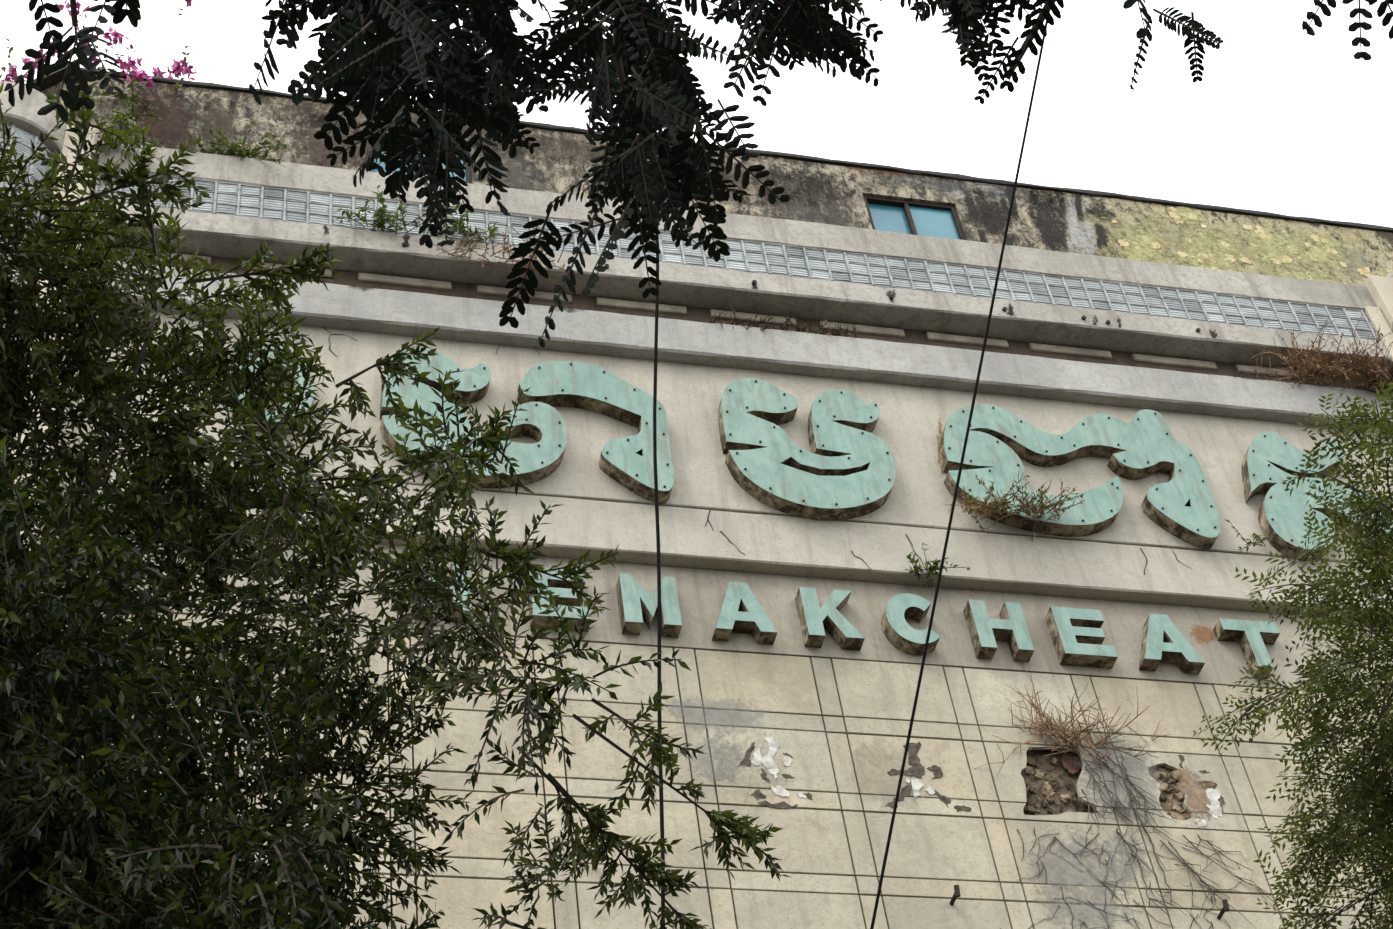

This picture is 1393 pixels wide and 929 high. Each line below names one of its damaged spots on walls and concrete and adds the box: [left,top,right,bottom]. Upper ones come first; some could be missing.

damp [194,94,383,169]
damp [457,125,624,200]
damp [707,164,853,227]
damp [881,175,1114,255]
damp [1377,231,1393,246]
spalling [738,733,813,809]
spalling [885,741,971,812]
spalling [1021,750,1096,815]
spalling [1149,755,1225,827]